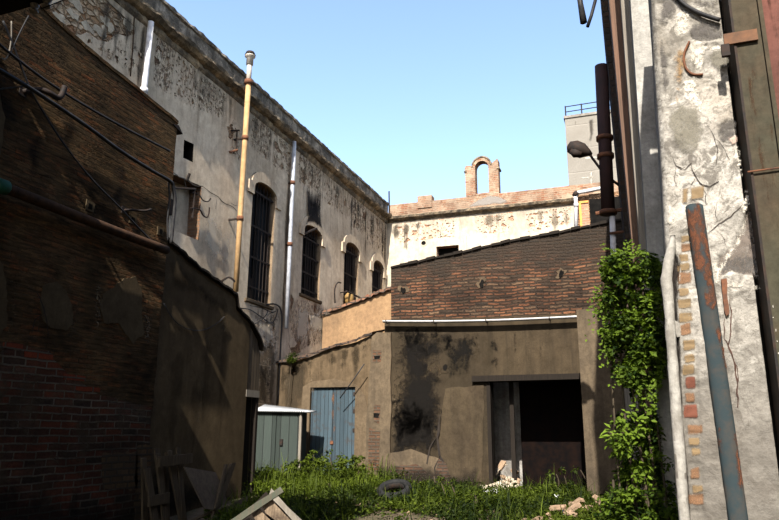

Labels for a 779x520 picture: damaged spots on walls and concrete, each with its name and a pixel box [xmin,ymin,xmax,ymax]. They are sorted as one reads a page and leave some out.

flaking render [48,0,142,71]
flaking render [154,37,226,116]
crack [672,128,743,245]
flaking render [397,218,455,243]
rust [687,202,717,309]
flaking render [672,235,702,455]
flaking render [688,467,703,504]